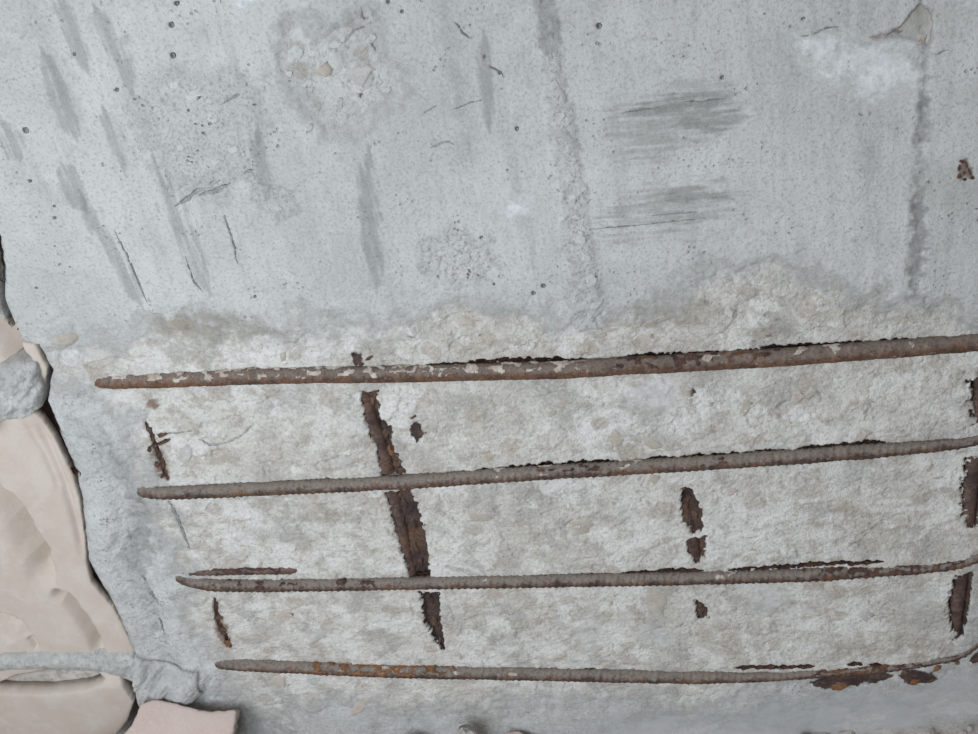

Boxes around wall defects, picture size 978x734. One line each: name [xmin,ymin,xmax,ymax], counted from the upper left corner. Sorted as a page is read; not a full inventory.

spalling [868,4,933,45]
peeling [271,5,408,141]
leakage [793,32,925,105]
spalling [134,68,269,195]
rust [957,159,974,181]
rust [361,390,406,475]
rust [409,415,426,443]
rust [385,489,431,575]
spalling [44,255,978,725]
rust [680,487,708,563]
rust [418,591,445,650]
rust [809,653,978,691]